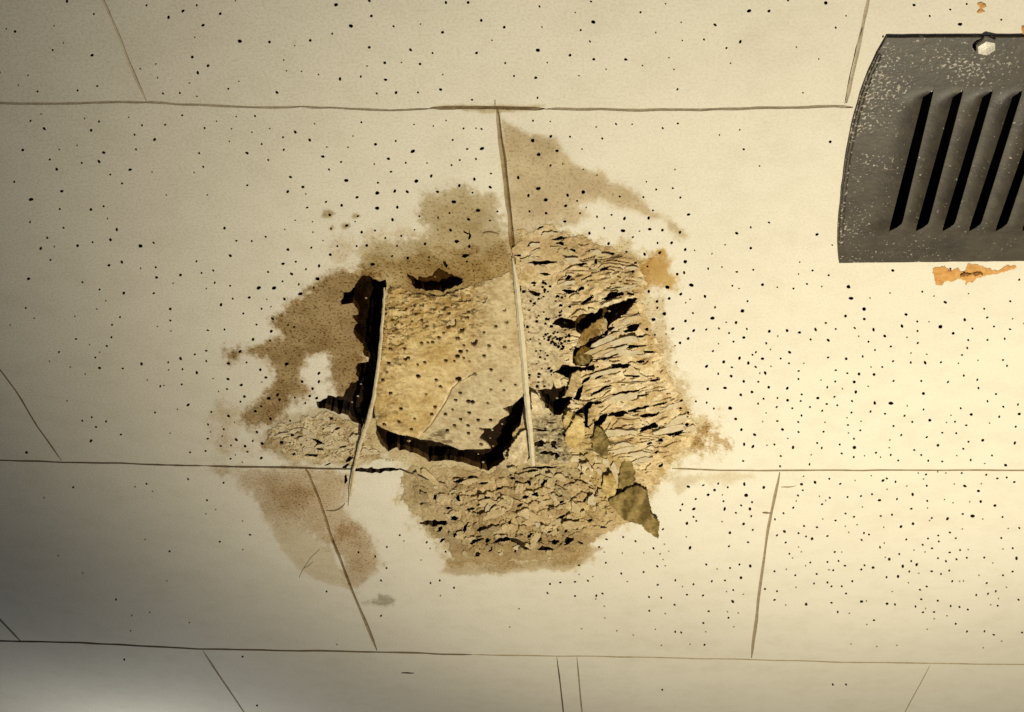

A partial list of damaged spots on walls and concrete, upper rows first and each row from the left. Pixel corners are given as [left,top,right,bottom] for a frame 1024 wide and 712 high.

spalling [261,411,394,467]
water stain [228,244,519,425]
spalling [400,224,698,566]
rust [932,263,1016,286]